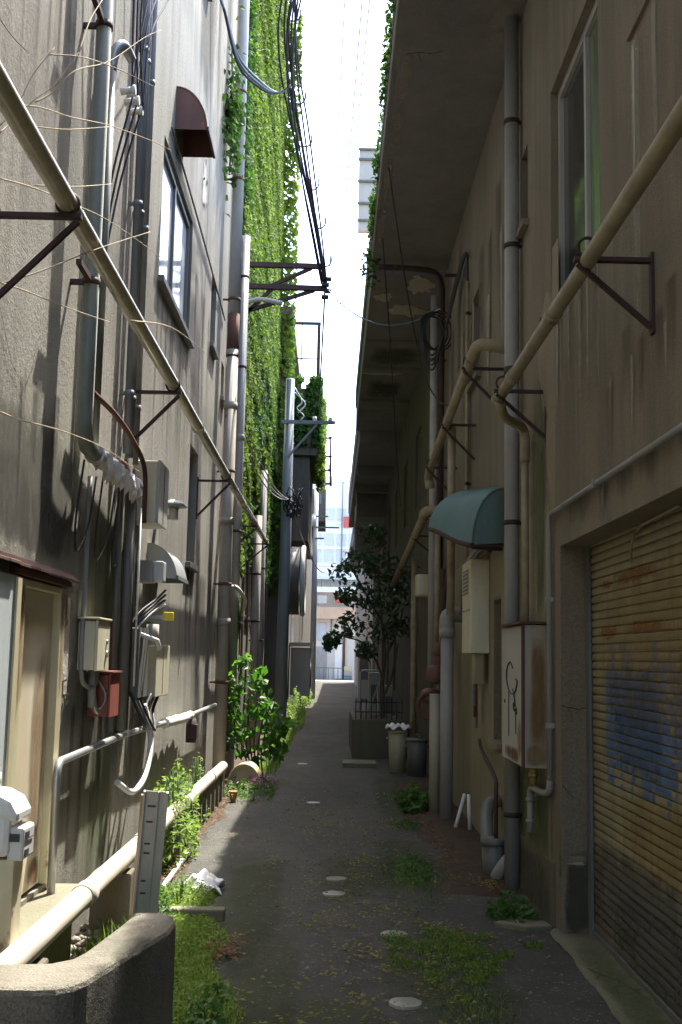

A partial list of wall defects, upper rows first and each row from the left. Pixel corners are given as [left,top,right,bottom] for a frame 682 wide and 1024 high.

rust [507,659,544,765]